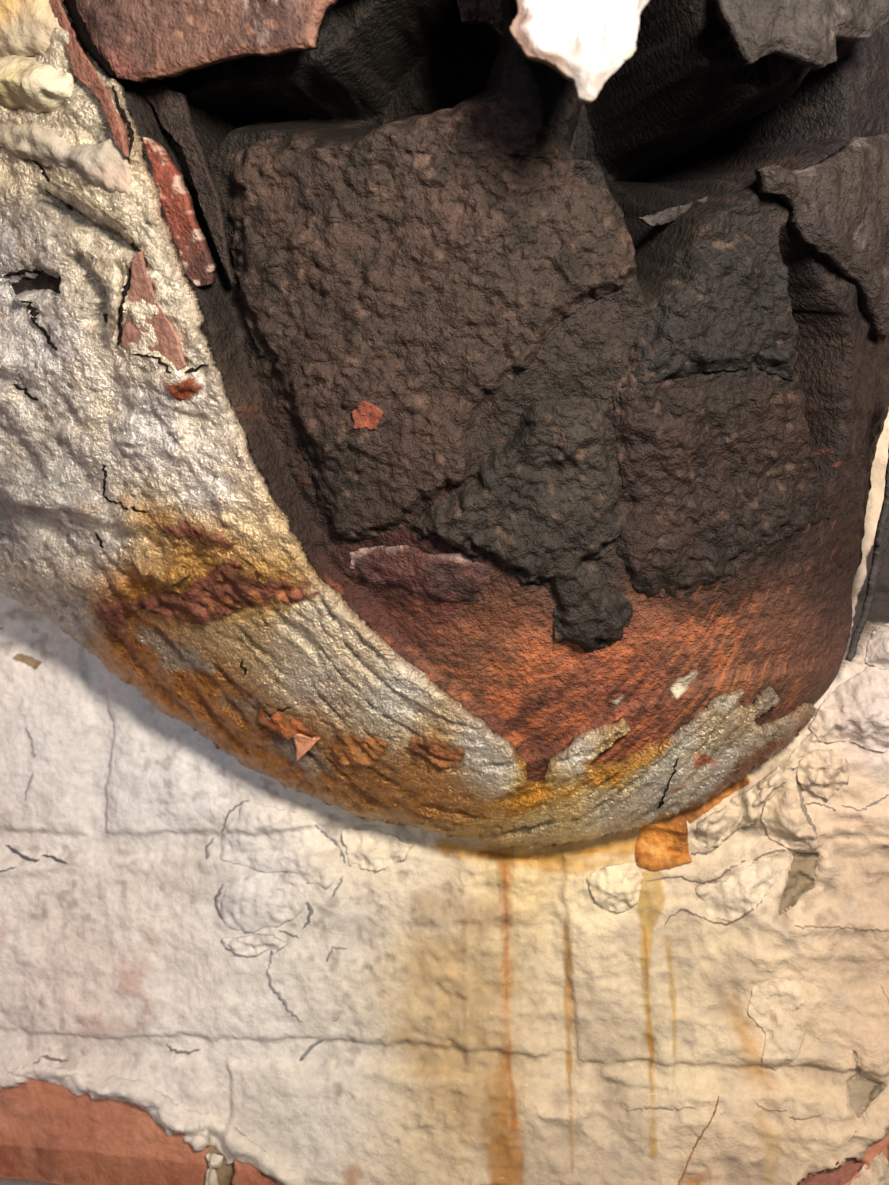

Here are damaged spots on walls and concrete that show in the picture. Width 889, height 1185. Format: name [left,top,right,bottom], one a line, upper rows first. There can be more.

peeling [457,0,649,104]
peeling [714,0,889,71]
peeling [754,132,889,335]
crack [5,269,60,351]
crack [14,384,39,401]
crack [102,464,147,513]
corrosion [96,521,319,664]
corrosion [259,707,315,740]
corrosion [330,733,387,768]
crack [0,845,67,872]
corrosion [438,775,750,995]
peeling [8,1063,305,1185]